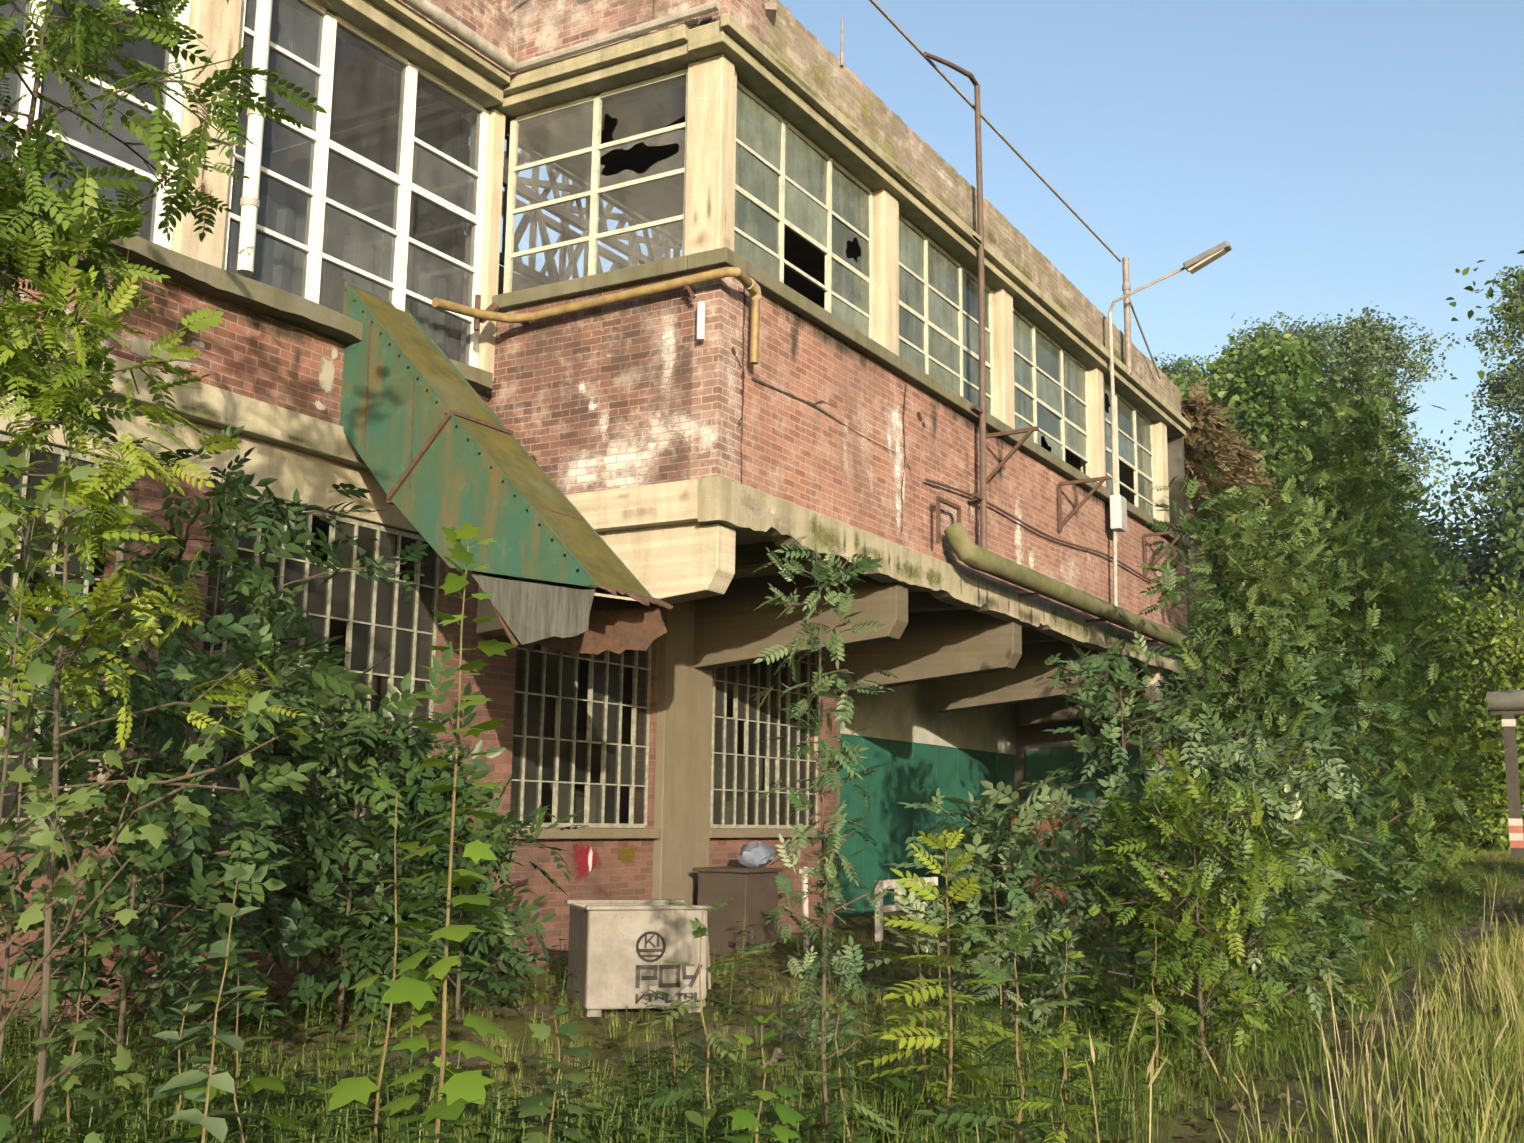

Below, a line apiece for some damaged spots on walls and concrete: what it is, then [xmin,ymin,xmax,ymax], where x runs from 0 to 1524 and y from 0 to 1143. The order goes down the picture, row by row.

spalling [683,16,712,26]
leakage [792,313,866,365]
leakage [569,414,715,488]
leakage [887,411,905,510]
leakage [933,410,1007,476]
leakage [1075,484,1110,513]
leakage [1015,515,1033,567]